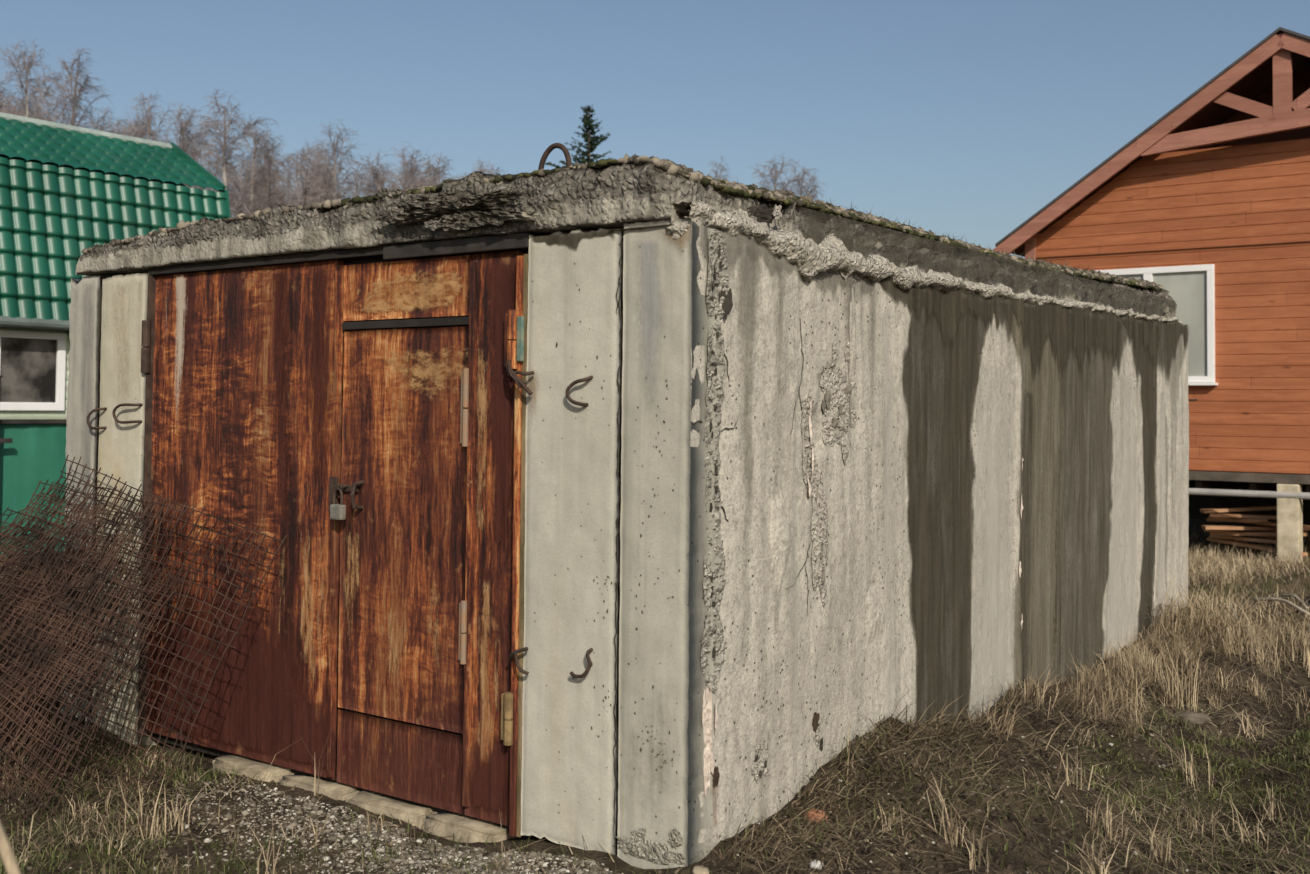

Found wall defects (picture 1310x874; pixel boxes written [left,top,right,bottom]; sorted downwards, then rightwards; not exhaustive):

spalling [750,204,782,224]
corrosion [366,273,462,311]
corrosion [388,350,462,390]
corrosion [478,360,487,492]
spalling [801,339,858,607]
damp [800,207,1190,724]
corrosion [301,544,314,677]
corrosion [345,536,359,611]
corrosion [478,583,500,752]
spalling [615,827,686,865]